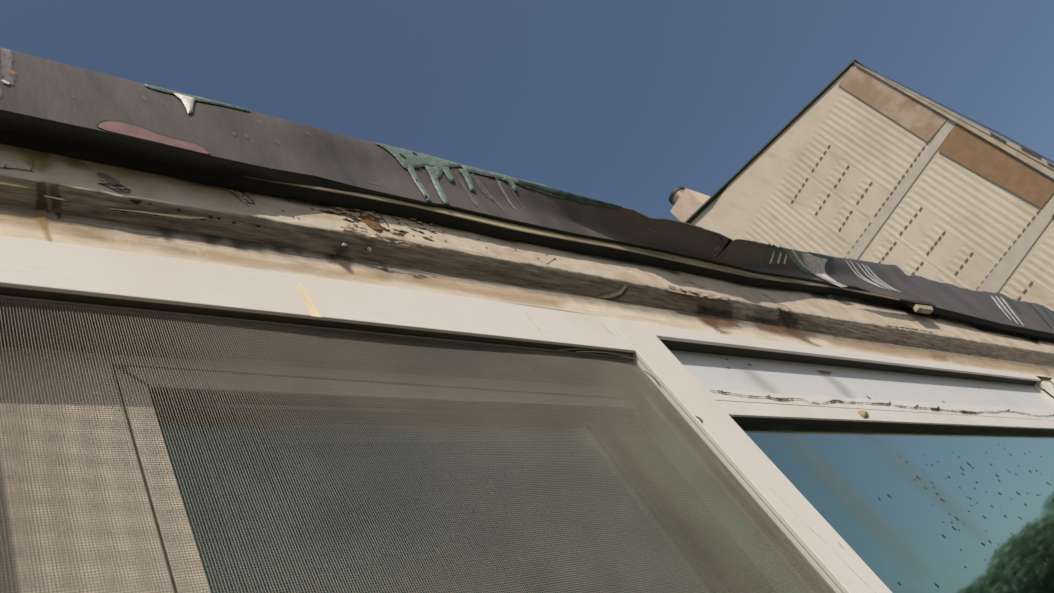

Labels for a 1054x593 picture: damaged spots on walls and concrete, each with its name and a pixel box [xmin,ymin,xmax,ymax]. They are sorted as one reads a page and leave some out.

water stain [36,183,61,210]
peeling [96,172,236,224]
water stain [180,178,334,208]
peeling [310,202,446,251]
water stain [325,249,350,271]
water stain [556,248,676,273]
water stain [710,277,936,320]
water stain [967,324,1054,344]